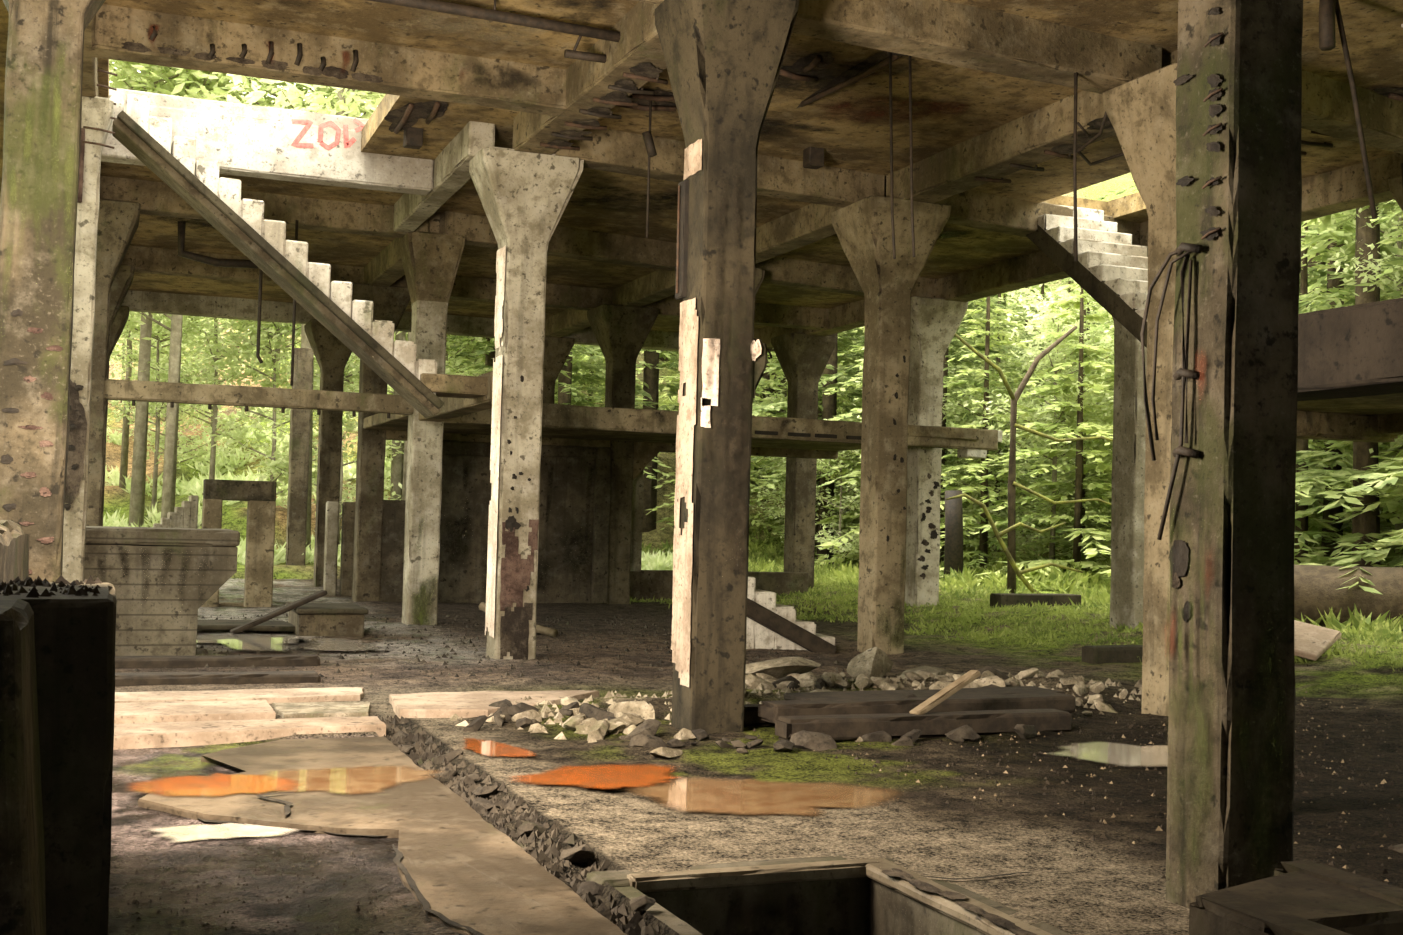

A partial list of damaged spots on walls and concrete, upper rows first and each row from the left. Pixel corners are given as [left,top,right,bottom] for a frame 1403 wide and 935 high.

peeling [485,245,539,660]
crack [198,792,484,935]